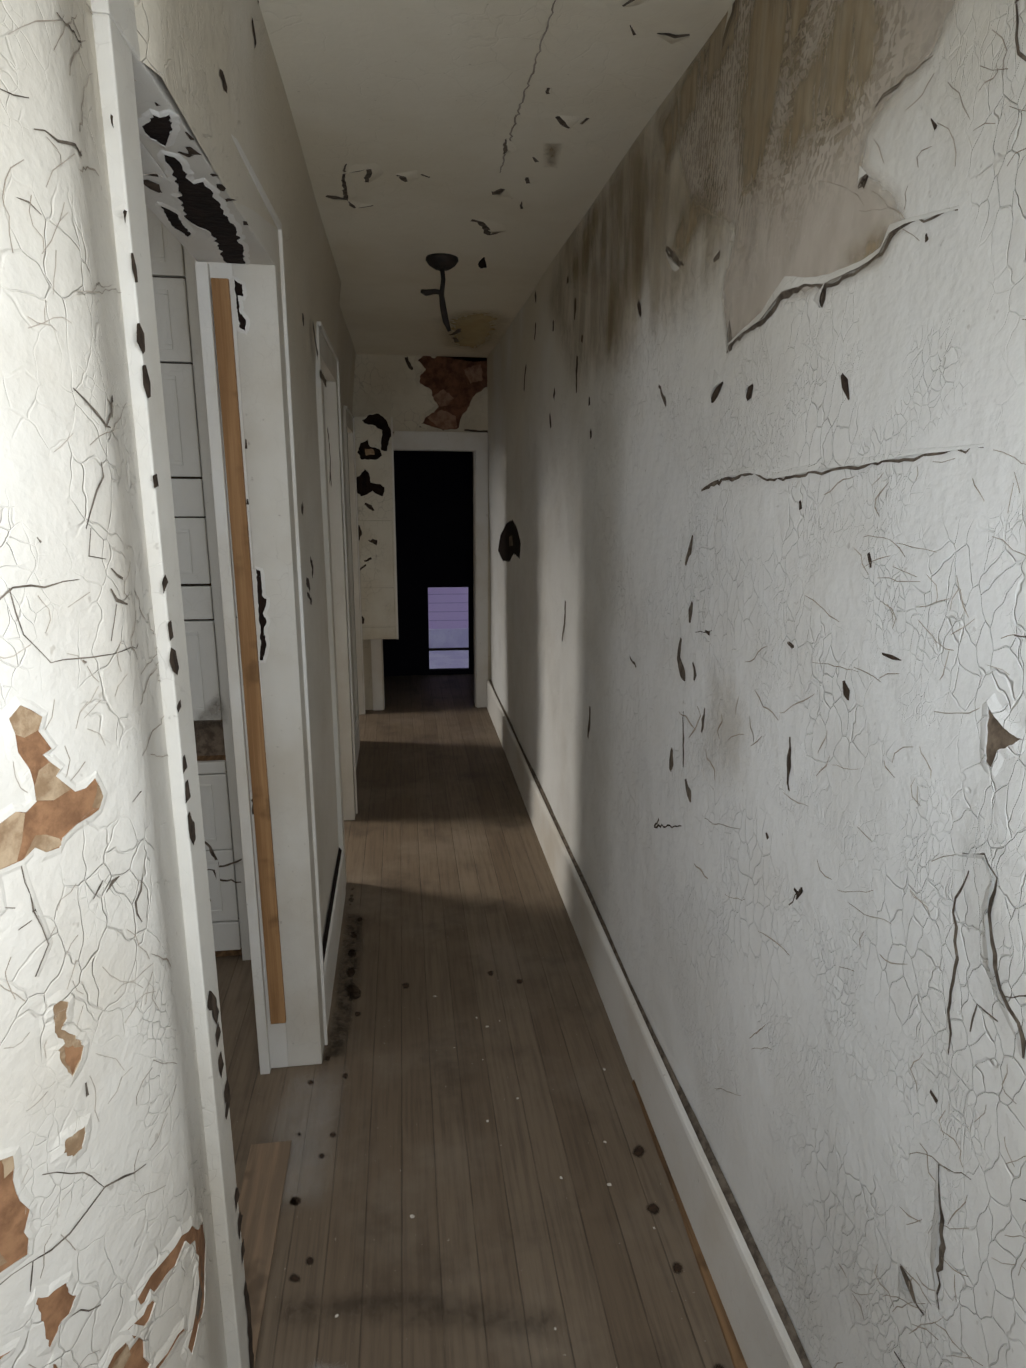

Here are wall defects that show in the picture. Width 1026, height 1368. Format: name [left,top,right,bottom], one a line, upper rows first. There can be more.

spalling [138,102,251,335]
damp [663,0,953,339]
peeling [356,412,395,511]
crack [0,388,168,780]
crack [701,443,1026,714]
peeling [0,696,108,917]
peeling [183,755,196,845]
crack [669,601,932,829]
peeling [0,1145,38,1280]
crack [0,864,177,1292]
peeling [97,1213,206,1368]
crack [838,853,1026,1368]